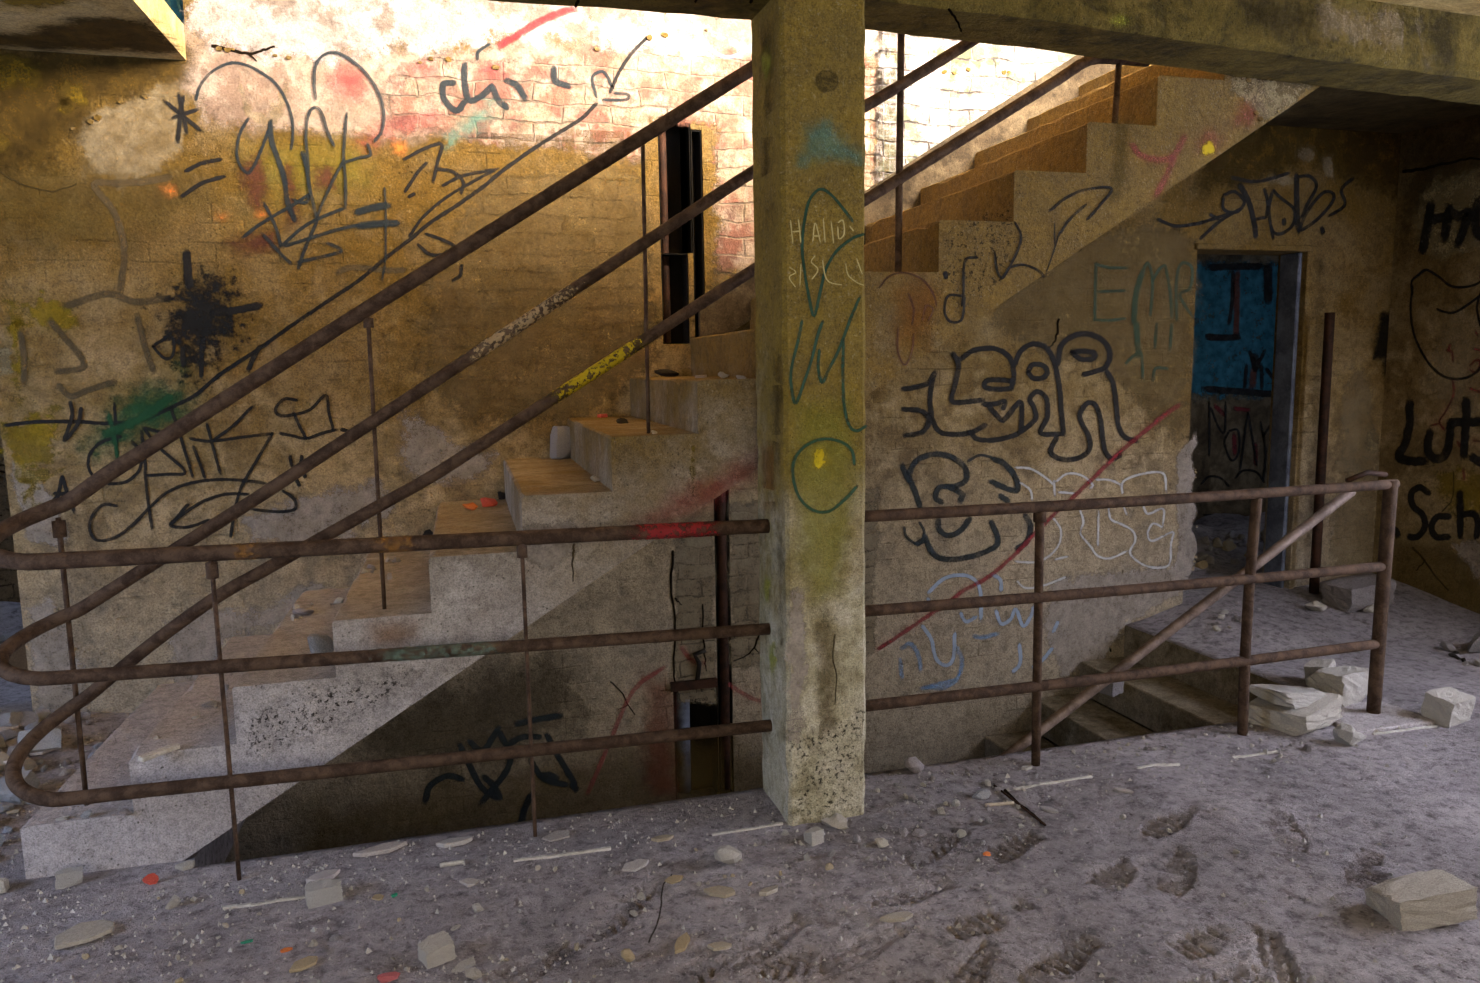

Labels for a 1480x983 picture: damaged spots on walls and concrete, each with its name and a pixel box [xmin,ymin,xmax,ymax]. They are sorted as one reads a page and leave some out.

damp [0,0,192,171]
spalling [176,0,755,429]
peeling [0,290,89,712]